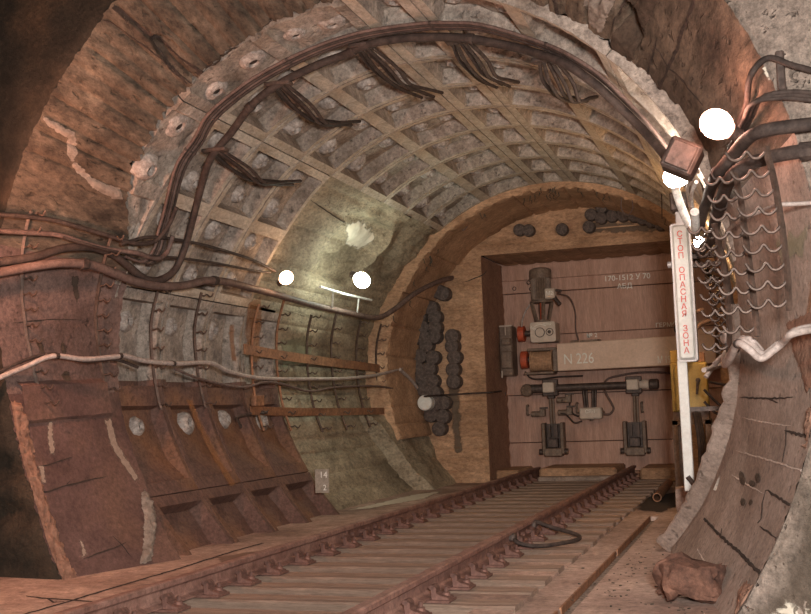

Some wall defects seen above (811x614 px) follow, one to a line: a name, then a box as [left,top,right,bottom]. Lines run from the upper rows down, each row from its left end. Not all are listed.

spalling [583,0,660,62]
crack [740,396,792,404]
crack [782,430,811,462]
crack [44,476,106,493]
crack [757,490,791,541]
crack [703,518,762,576]